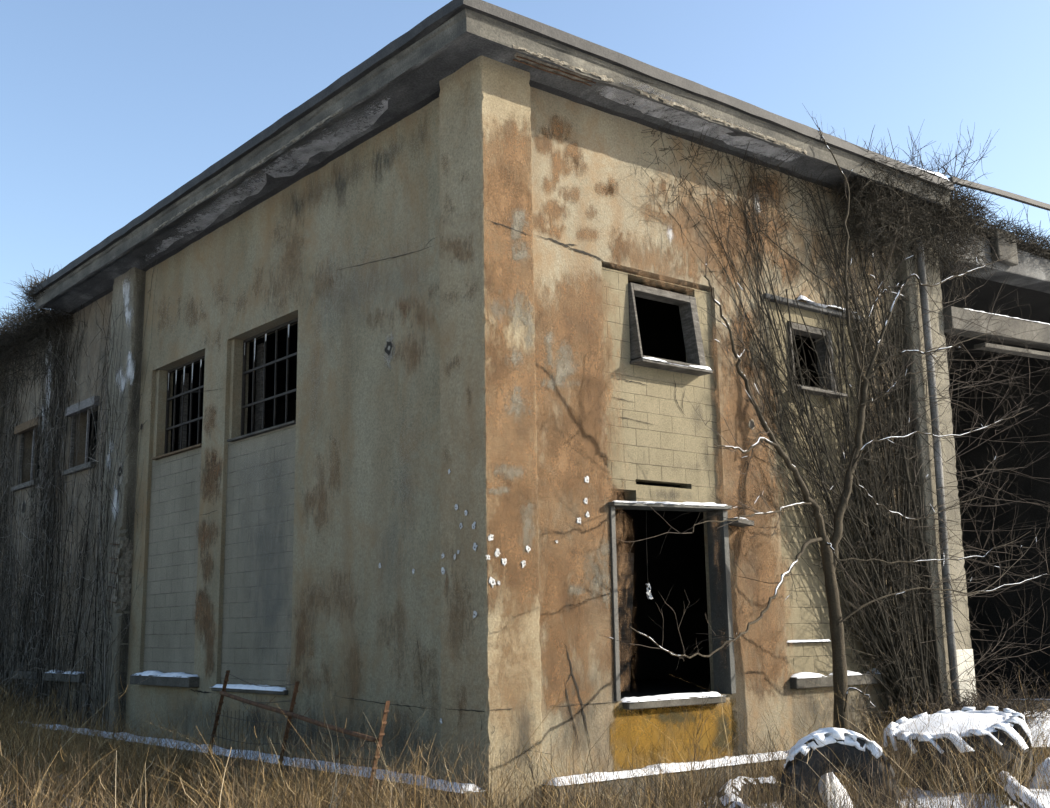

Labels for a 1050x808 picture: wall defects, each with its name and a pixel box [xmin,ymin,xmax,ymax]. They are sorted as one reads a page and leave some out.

spalling [153,106,344,232]
crack [329,237,437,272]
crack [489,220,605,264]